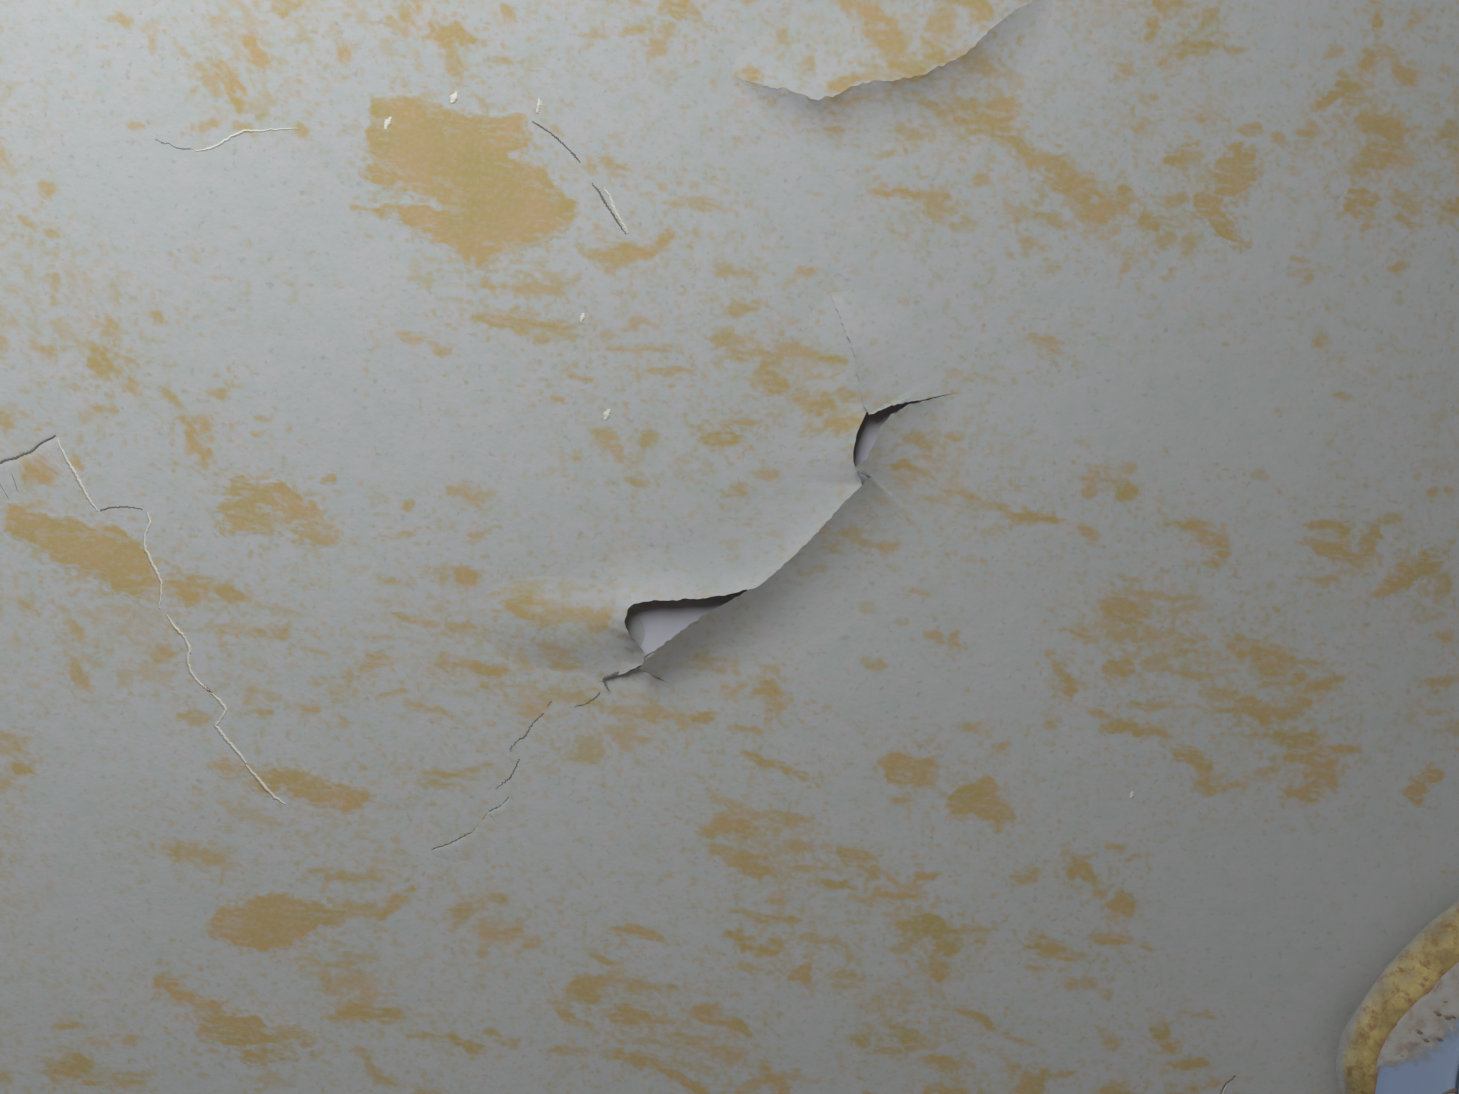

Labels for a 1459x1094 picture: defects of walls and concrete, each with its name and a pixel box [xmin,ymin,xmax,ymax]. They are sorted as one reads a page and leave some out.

peeling [732,0,1053,152]
crack [0,435,285,805]
crack [431,692,600,862]
peeling [556,289,961,690]